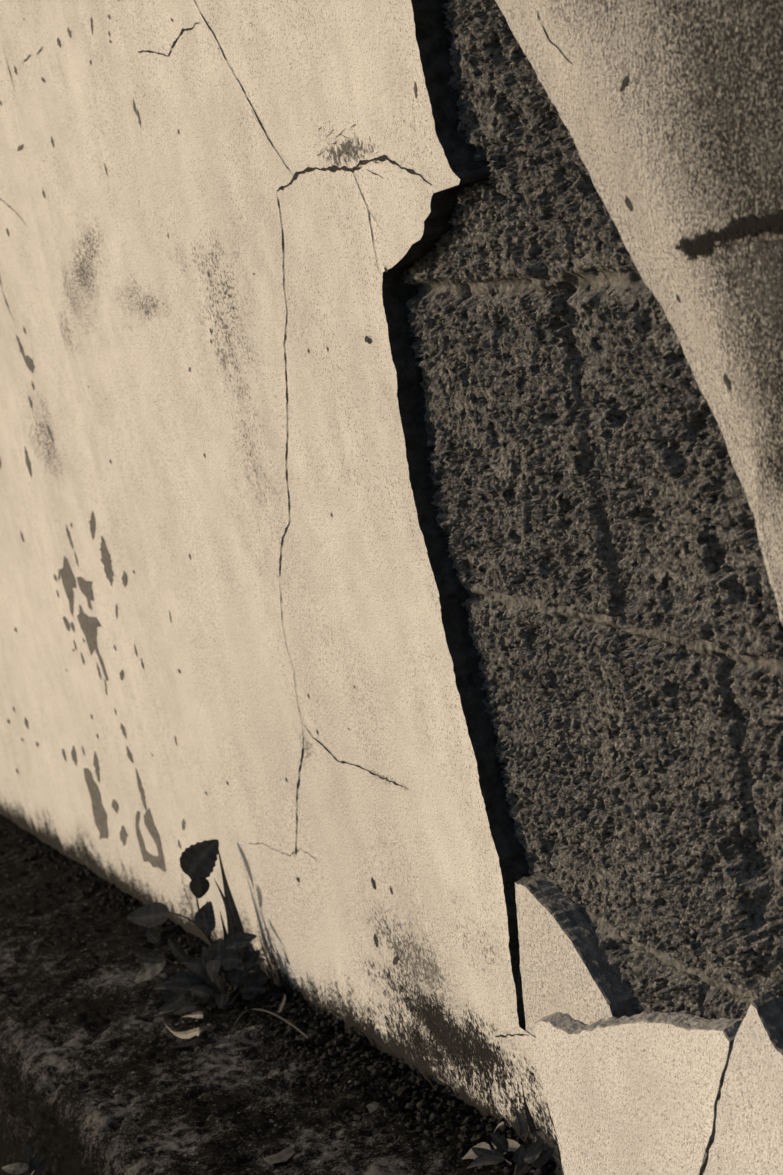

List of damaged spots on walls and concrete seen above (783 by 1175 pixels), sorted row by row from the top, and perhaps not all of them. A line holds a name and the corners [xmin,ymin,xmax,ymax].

crack [138,1,431,864]
spalling [382,0,783,1027]